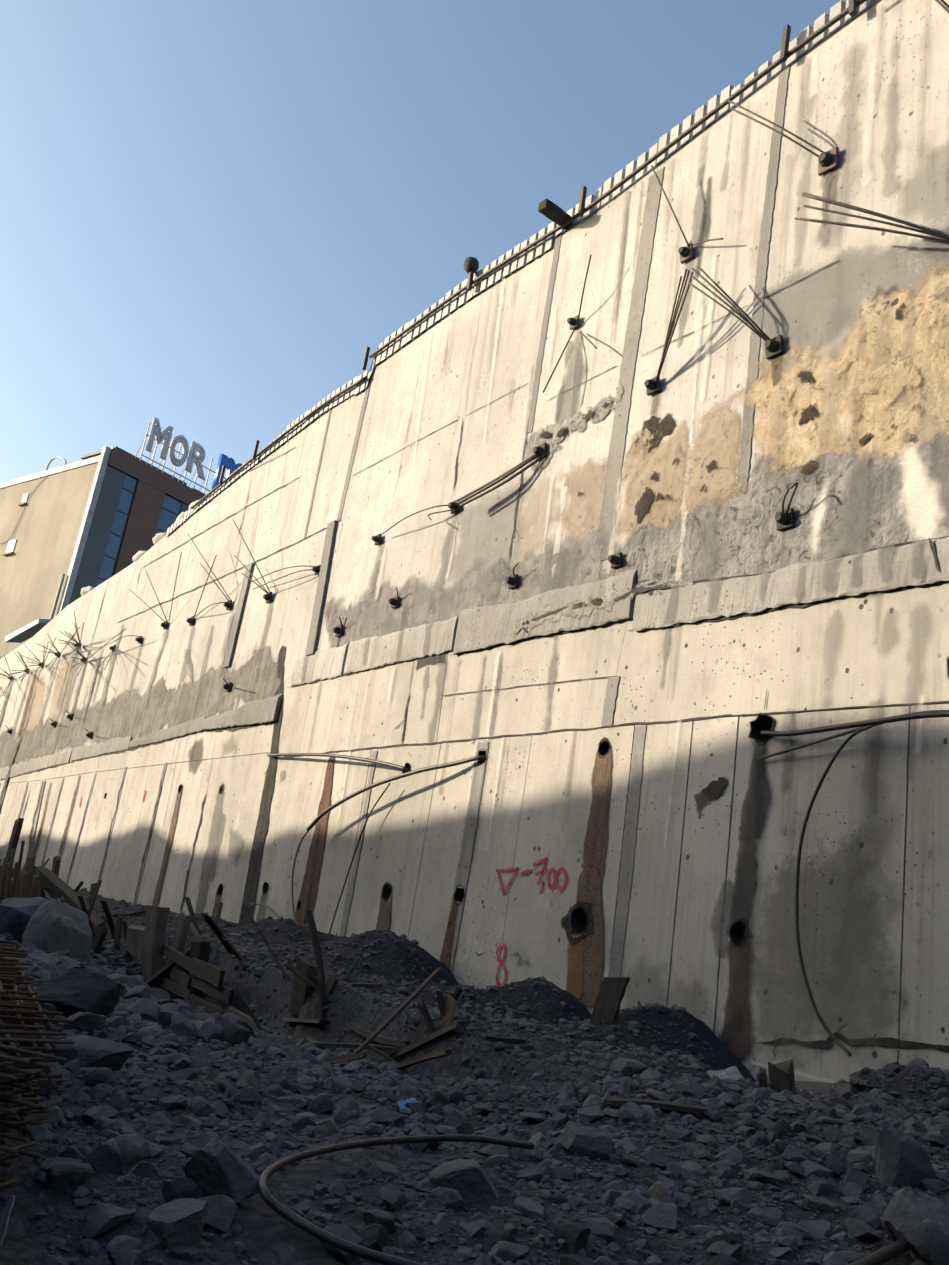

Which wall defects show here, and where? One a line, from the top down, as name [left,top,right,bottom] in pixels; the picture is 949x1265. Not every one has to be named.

leakage [761,229,949,376]
spalling [524,385,624,471]
spalling [562,270,949,543]
spalling [513,578,694,634]
leakage [325,432,949,653]
leakage [0,614,281,771]
rust [152,785,183,907]
rust [293,757,334,927]
rust [440,901,458,969]
rust [566,740,612,1007]
spalling [694,777,727,818]
leakage [712,741,770,1060]